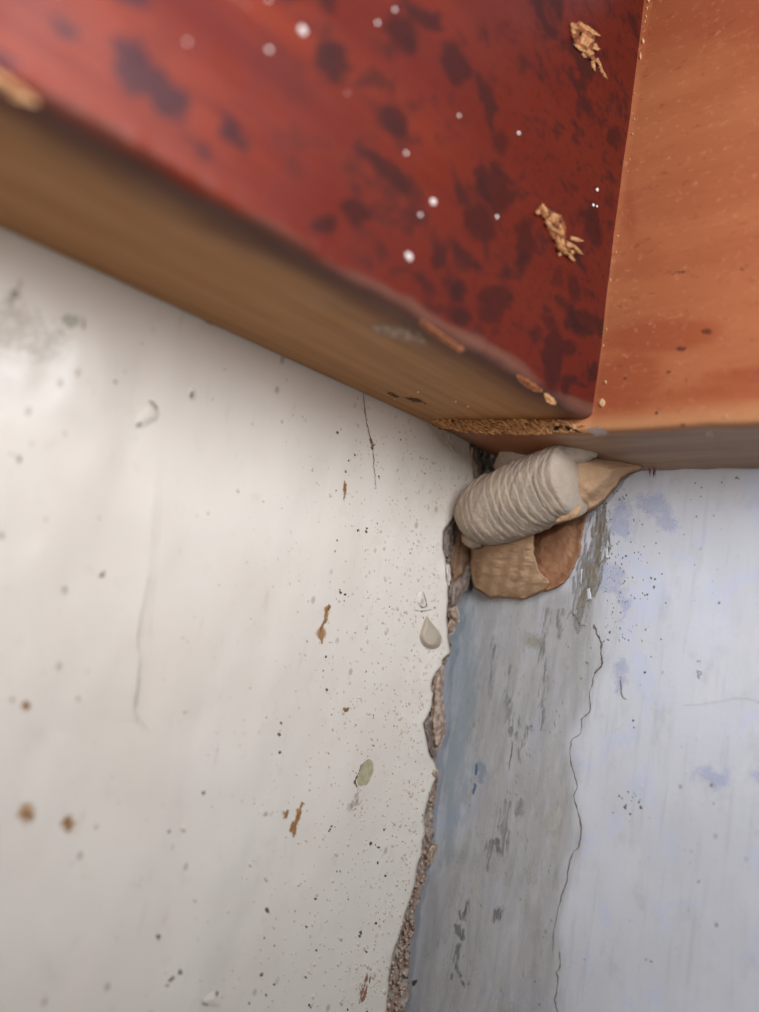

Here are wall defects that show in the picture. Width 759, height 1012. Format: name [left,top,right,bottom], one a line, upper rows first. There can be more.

corrosion [317,604,331,644]
crack [553,624,627,1012]